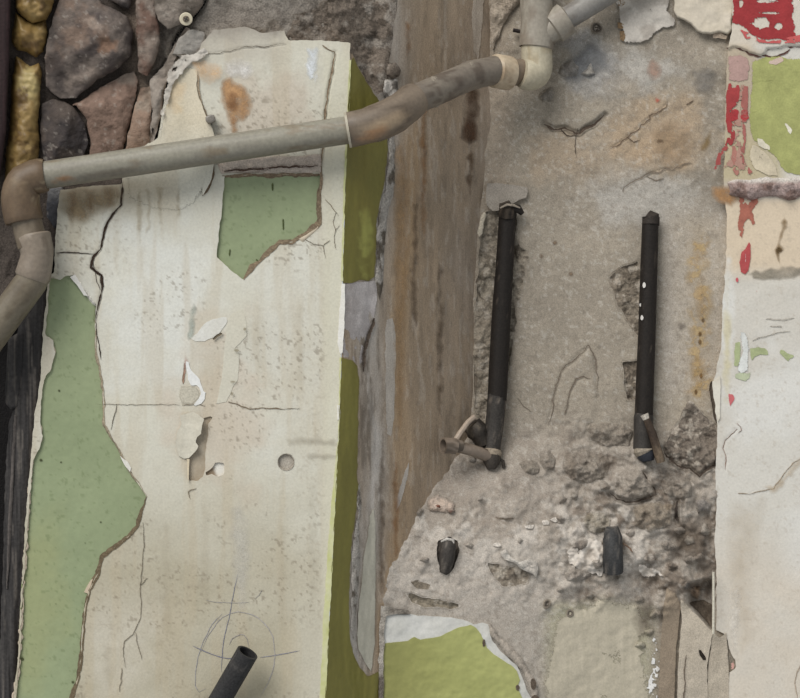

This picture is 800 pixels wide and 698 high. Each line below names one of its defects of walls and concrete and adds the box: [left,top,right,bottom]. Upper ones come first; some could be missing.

peeling [674,0,800,44]
corrosion [222,79,249,132]
crack [544,115,604,154]
crack [612,105,667,148]
peeling [126,154,322,279]
crack [60,178,124,358]
corrosion [689,243,710,397]
crack [100,404,203,428]
peeling [320,136,539,698]
crack [548,345,599,423]
spalling [663,376,721,476]
peeling [12,275,147,698]